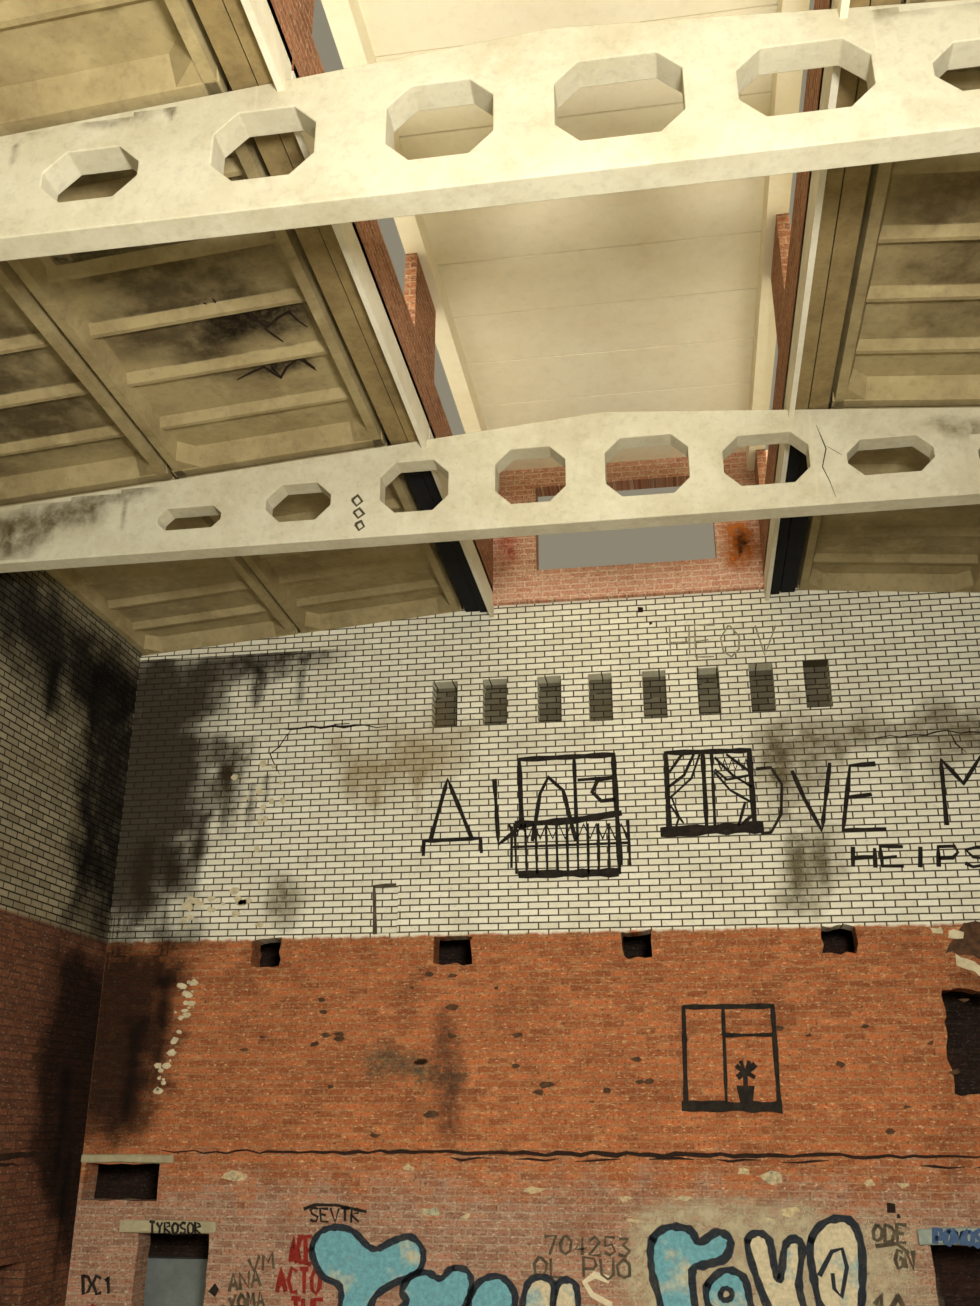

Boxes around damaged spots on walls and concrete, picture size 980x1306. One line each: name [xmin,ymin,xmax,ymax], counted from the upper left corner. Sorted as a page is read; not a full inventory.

water stain [763,724,869,784]
water stain [32,654,286,1256]
spalling [930,921,980,976]
spalling [310,1032,345,1047]
spalling [532,1082,556,1096]